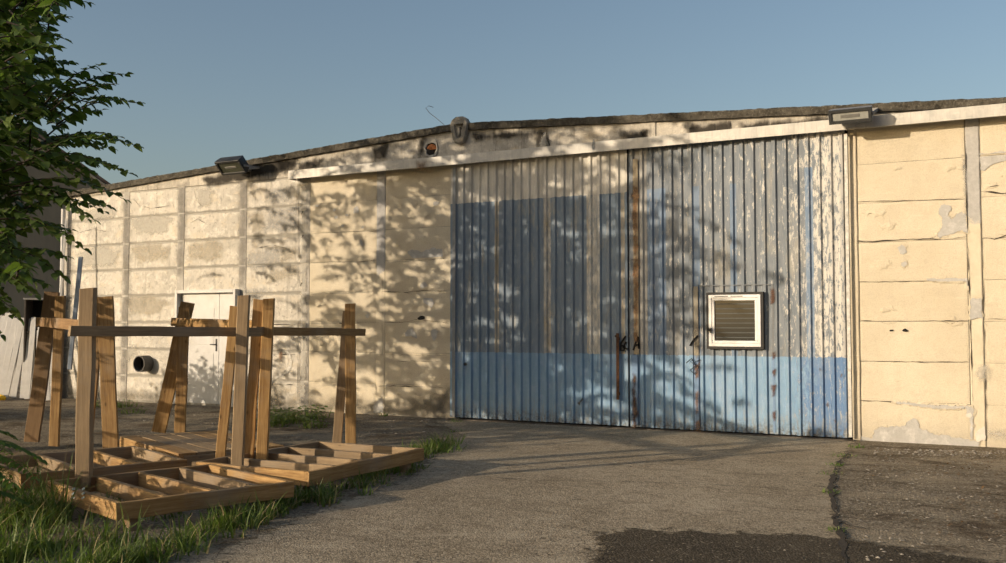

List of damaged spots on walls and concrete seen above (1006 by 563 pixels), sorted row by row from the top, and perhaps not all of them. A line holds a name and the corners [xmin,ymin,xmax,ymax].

peeling [934,204,970,239]
peeling [407,246,444,260]
corrosion [631,186,639,341]
peeling [861,400,980,447]